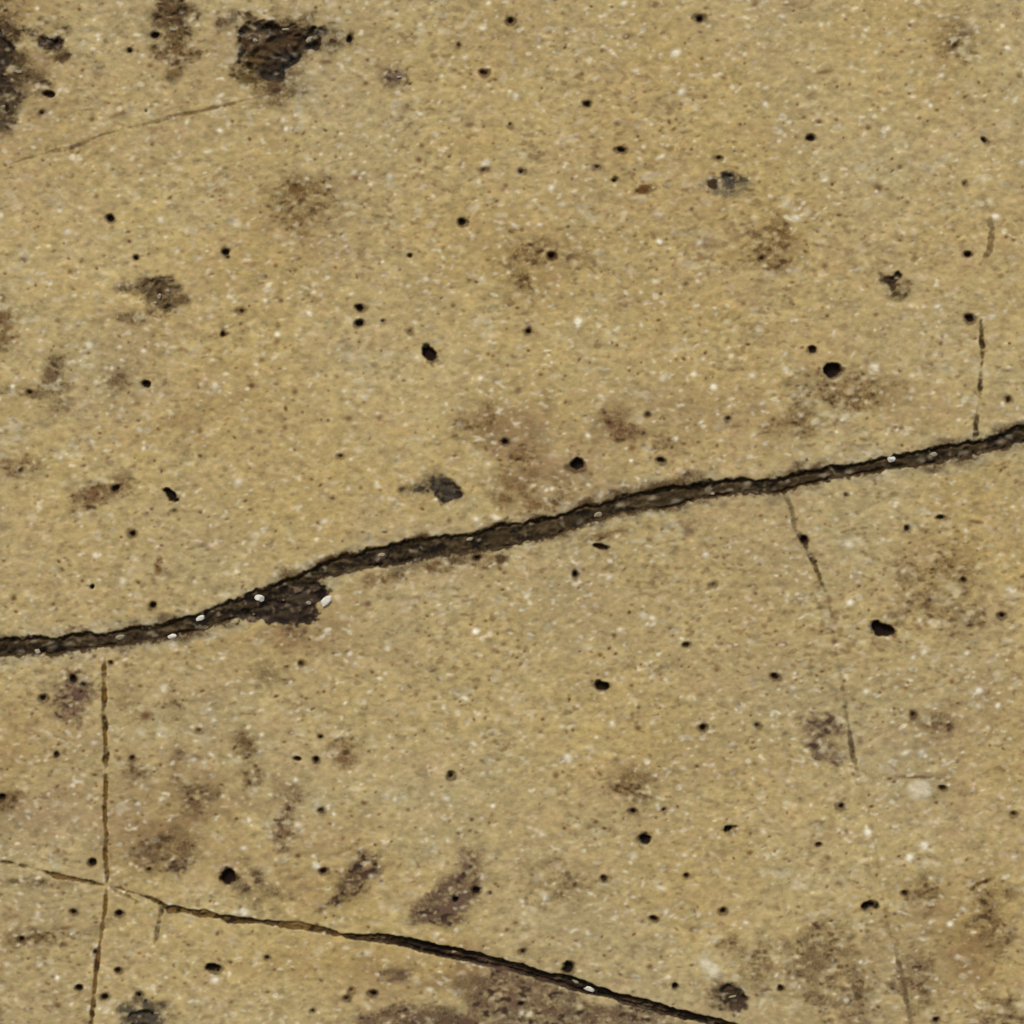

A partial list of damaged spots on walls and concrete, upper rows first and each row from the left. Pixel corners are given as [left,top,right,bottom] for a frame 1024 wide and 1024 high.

crack [977,320,985,391]
crack [0,416,1024,1024]